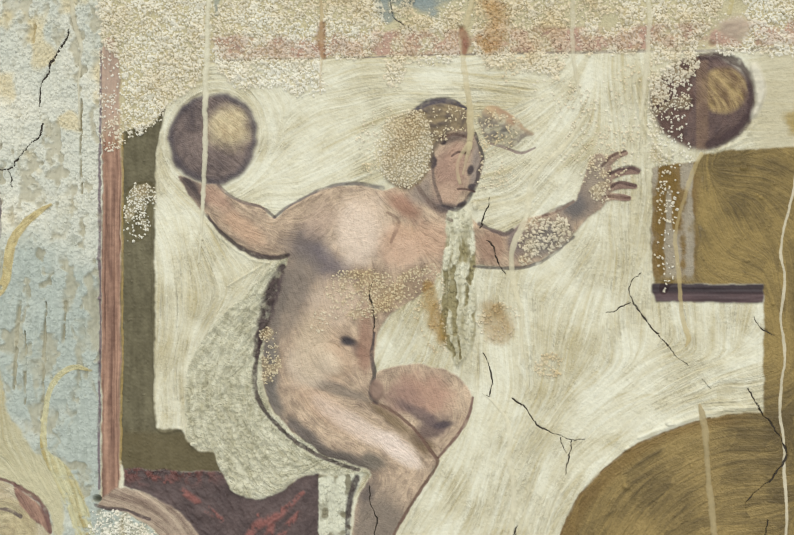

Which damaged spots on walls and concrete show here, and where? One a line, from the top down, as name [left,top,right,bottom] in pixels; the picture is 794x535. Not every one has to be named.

crack [0,29,69,187]
crack [606,273,689,366]
crack [512,398,583,468]
crack [746,390,787,502]